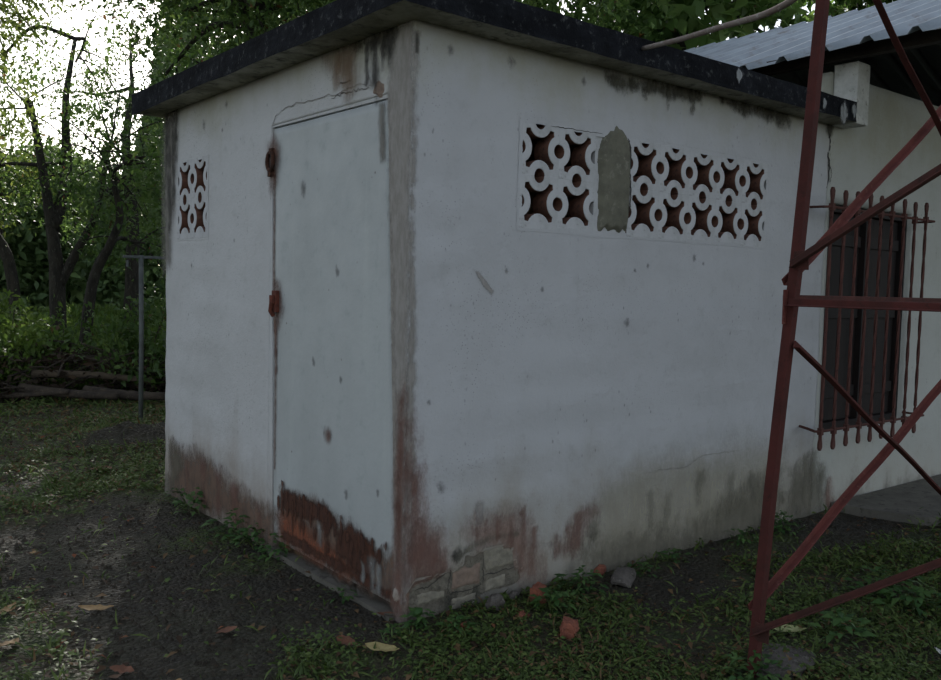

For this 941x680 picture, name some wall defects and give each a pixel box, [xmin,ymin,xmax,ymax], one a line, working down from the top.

water stain [332,28,398,87]
water stain [605,71,702,111]
water stain [720,97,790,128]
corrosion [169,397,407,617]
water stain [583,478,765,572]
spalling [406,538,520,621]